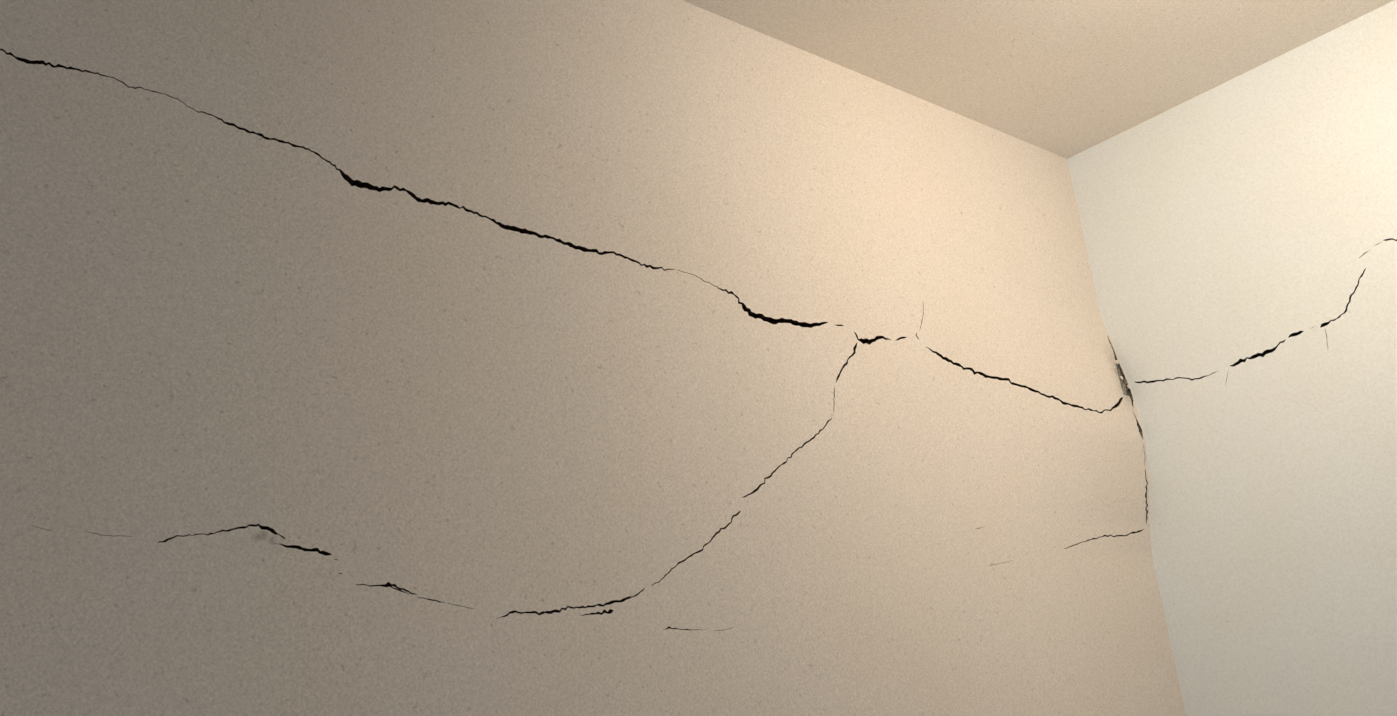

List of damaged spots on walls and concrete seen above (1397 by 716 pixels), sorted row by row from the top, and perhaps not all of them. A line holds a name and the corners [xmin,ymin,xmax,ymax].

crack [0,49,1397,619]